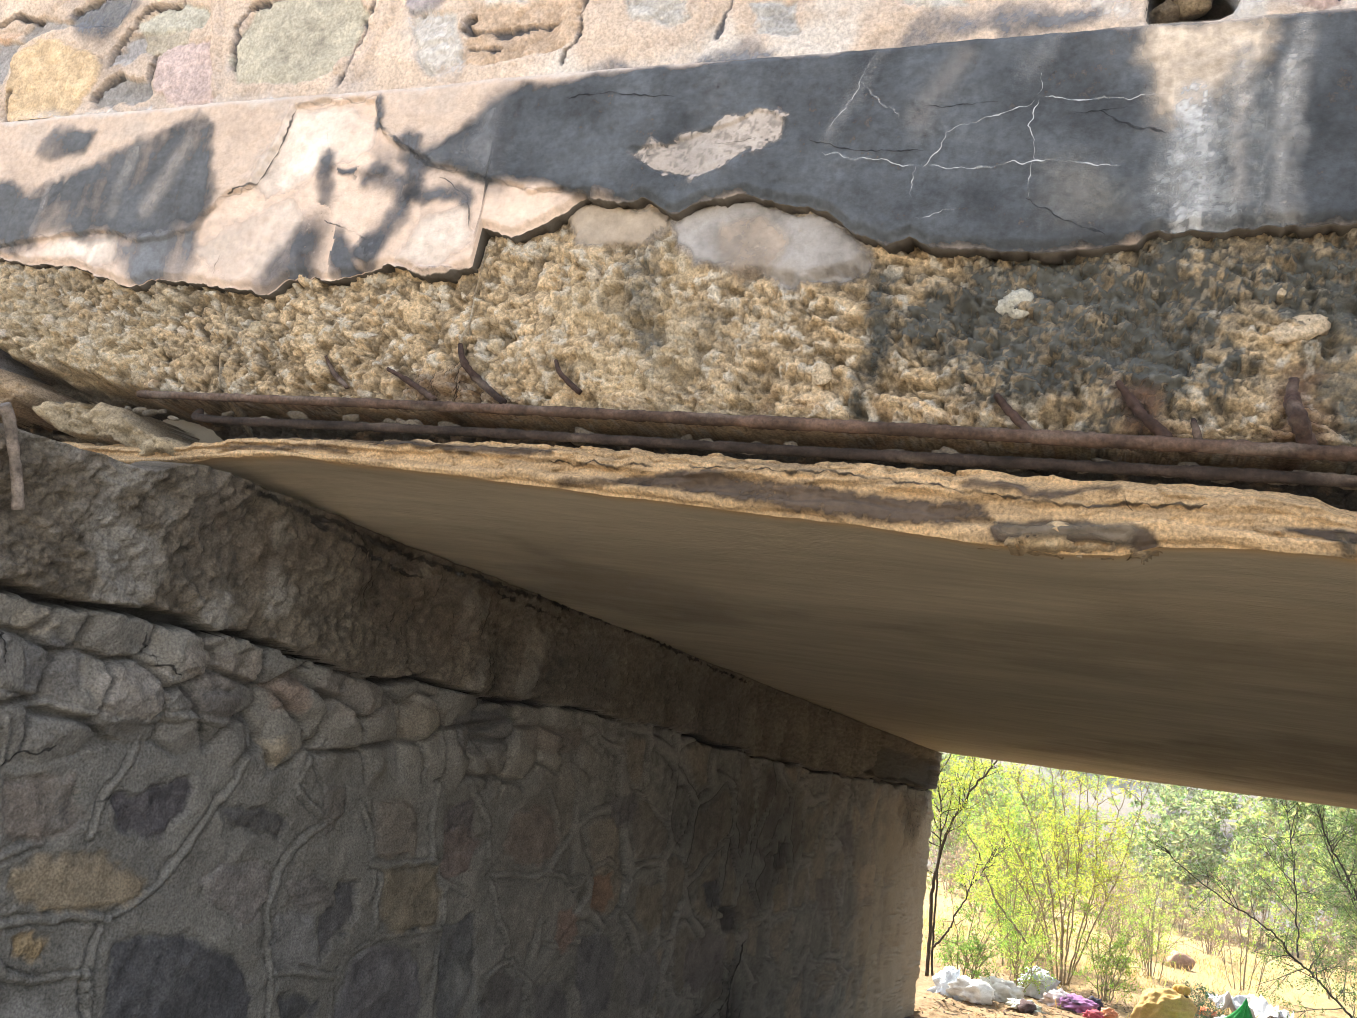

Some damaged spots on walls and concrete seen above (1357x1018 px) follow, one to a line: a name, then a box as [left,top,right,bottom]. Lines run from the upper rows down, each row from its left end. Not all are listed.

crack [569,91,669,99]
crack [228,111,296,194]
crack [376,96,470,227]
crack [810,68,1166,234]
spalling [0,96,1357,512]
rust [223,437,554,455]
crack [142,632,182,676]